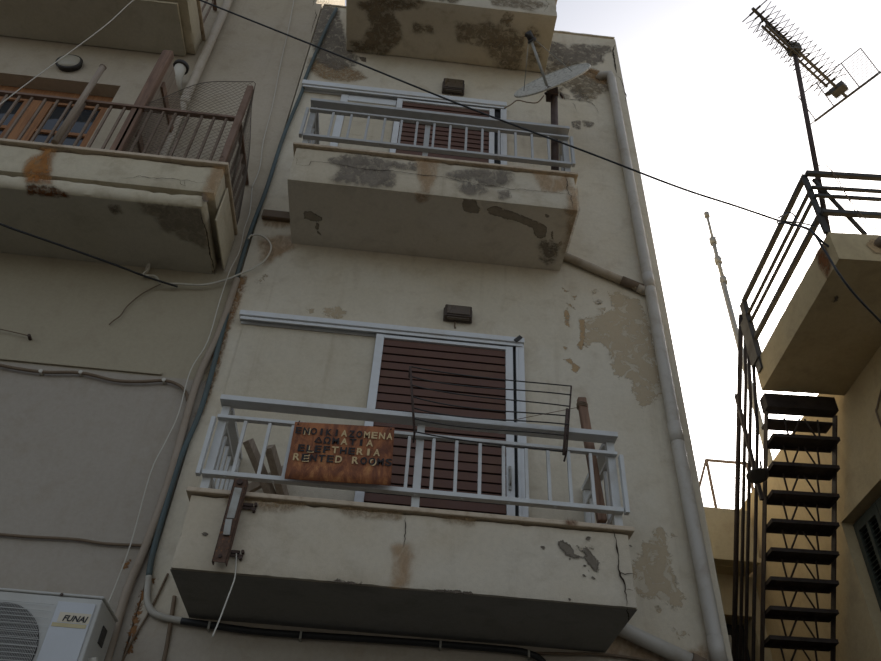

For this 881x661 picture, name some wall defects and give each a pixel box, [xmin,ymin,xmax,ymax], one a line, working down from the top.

leakage [311,0,423,81]
leakage [456,0,611,101]
corrosion [23,148,68,197]
leakage [329,154,416,186]
leakage [448,169,511,198]
spalling [462,199,562,264]
flaking render [562,287,662,406]
spalling [558,535,600,580]
crack [613,531,636,620]
flaking render [629,527,686,613]